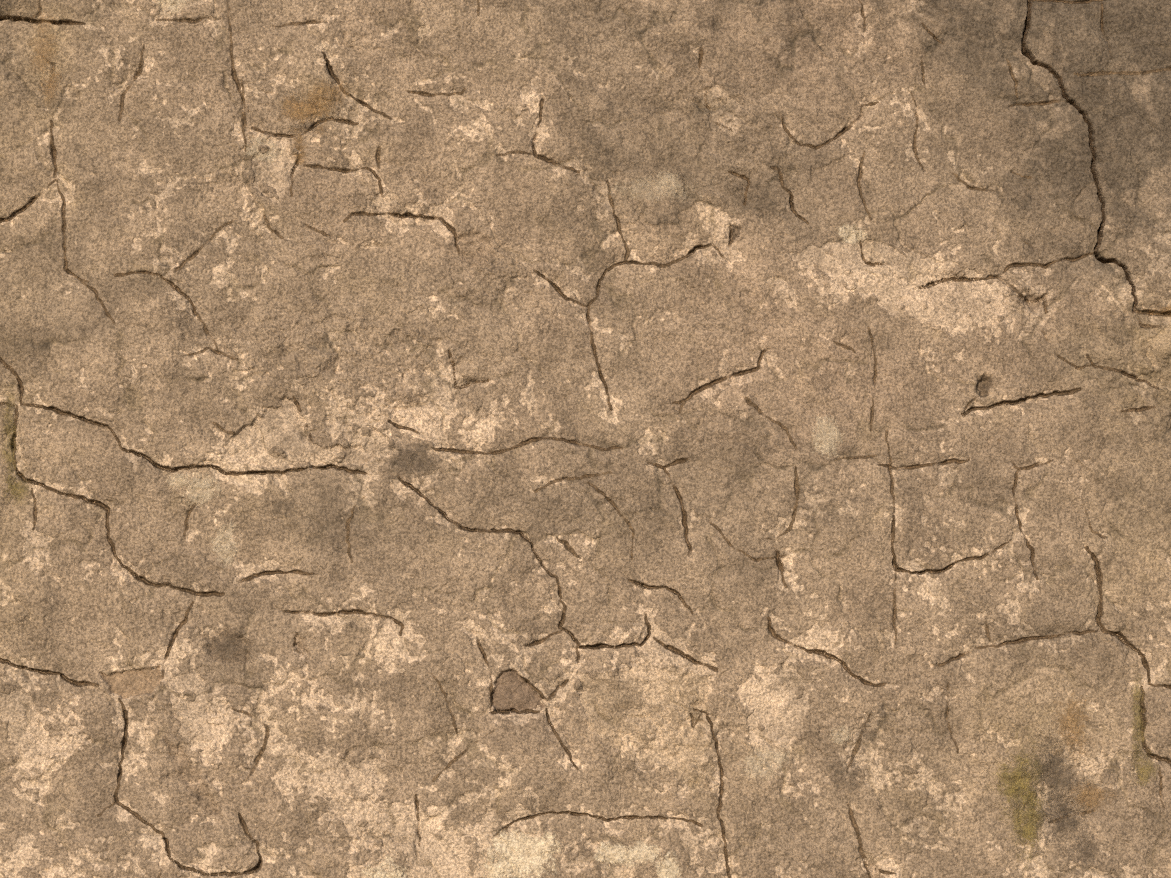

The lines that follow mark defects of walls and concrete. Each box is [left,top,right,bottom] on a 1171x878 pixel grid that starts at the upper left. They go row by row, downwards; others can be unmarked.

crack [0,120,238,361]
crack [0,658,262,878]
crack [0,357,367,679]
crack [118,7,466,254]
crack [387,419,718,770]
crack [497,708,731,878]
crack [496,98,809,411]
crack [648,350,800,589]
crack [835,326,1060,645]
crack [918,0,1171,328]
crack [937,510,1171,808]
crack [961,354,1160,417]